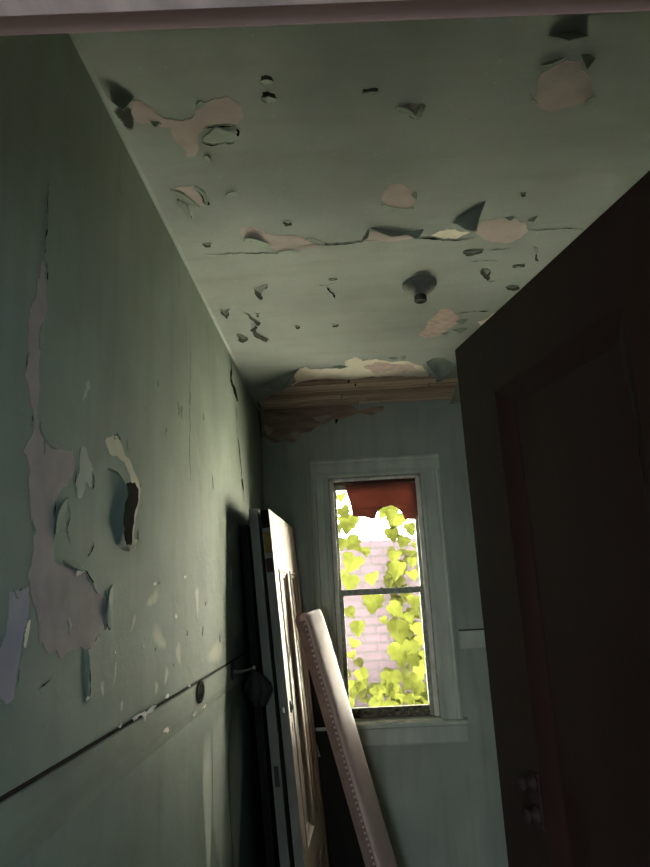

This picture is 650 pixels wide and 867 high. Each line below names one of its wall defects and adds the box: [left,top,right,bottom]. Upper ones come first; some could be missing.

peeling [530,54,597,112]
peeling [110,96,243,166]
peeling [170,185,212,219]
crack [207,201,586,255]
peeling [463,247,512,282]
peeling [254,284,268,300]
peeling [236,312,269,343]
peeling [418,308,495,338]
peeling [426,358,455,383]
flaking render [261,405,384,443]
peeling [0,179,114,705]